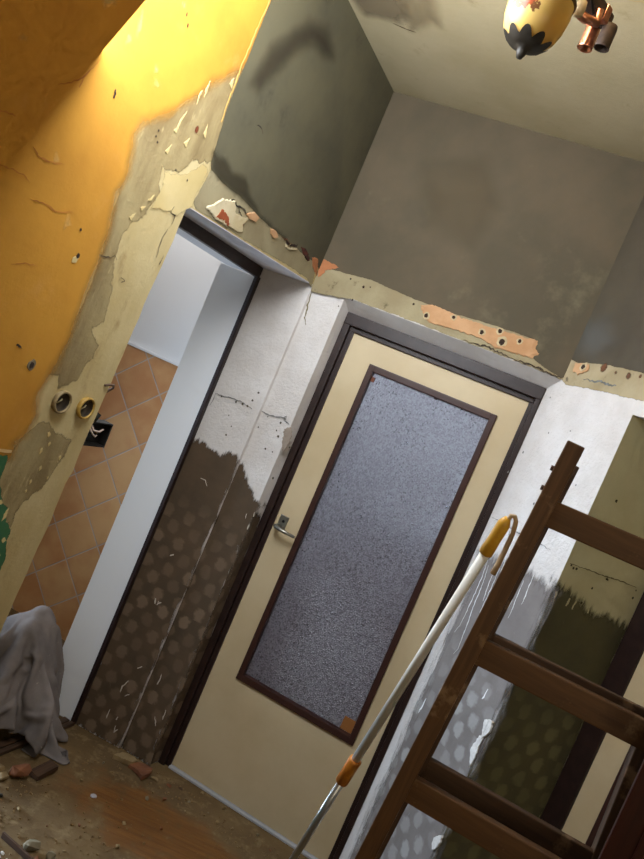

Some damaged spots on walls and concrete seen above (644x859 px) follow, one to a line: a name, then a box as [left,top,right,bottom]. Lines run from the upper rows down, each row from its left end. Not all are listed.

damp [355,0,405,20]
peeling [51,70,243,388]
spalling [206,198,259,233]
spalling [412,303,539,358]
spalling [573,362,589,375]
crack [210,393,289,424]